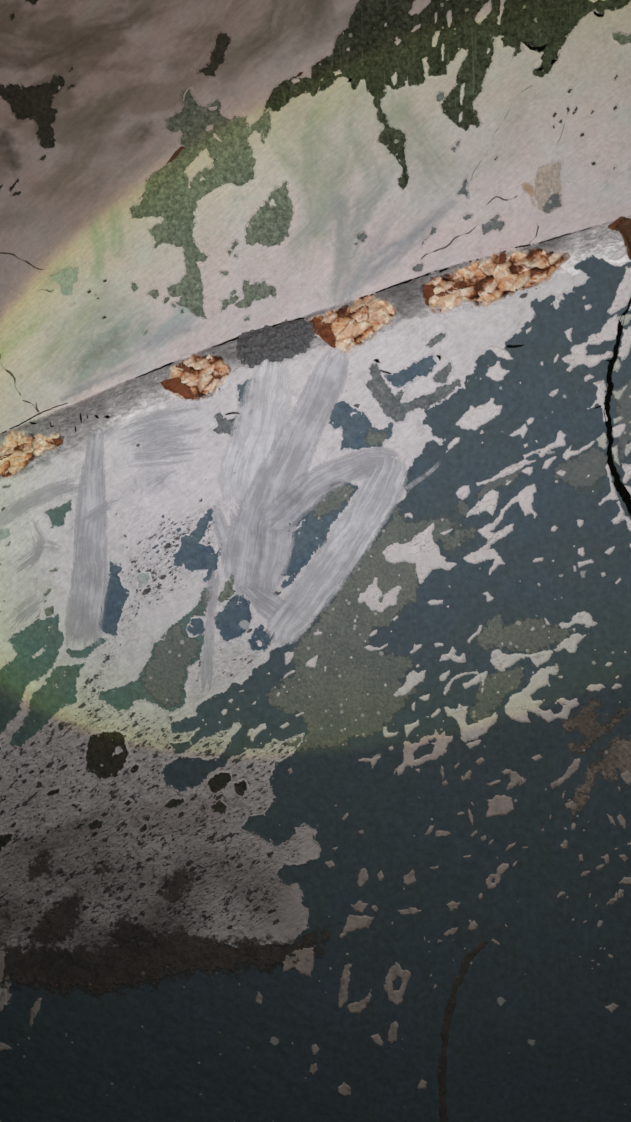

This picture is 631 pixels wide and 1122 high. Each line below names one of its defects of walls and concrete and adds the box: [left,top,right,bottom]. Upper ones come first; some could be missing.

peeling [0,176,23,198]
peeling [128,0,631,438]
crack [595,298,631,515]
peeling [0,243,631,1122]